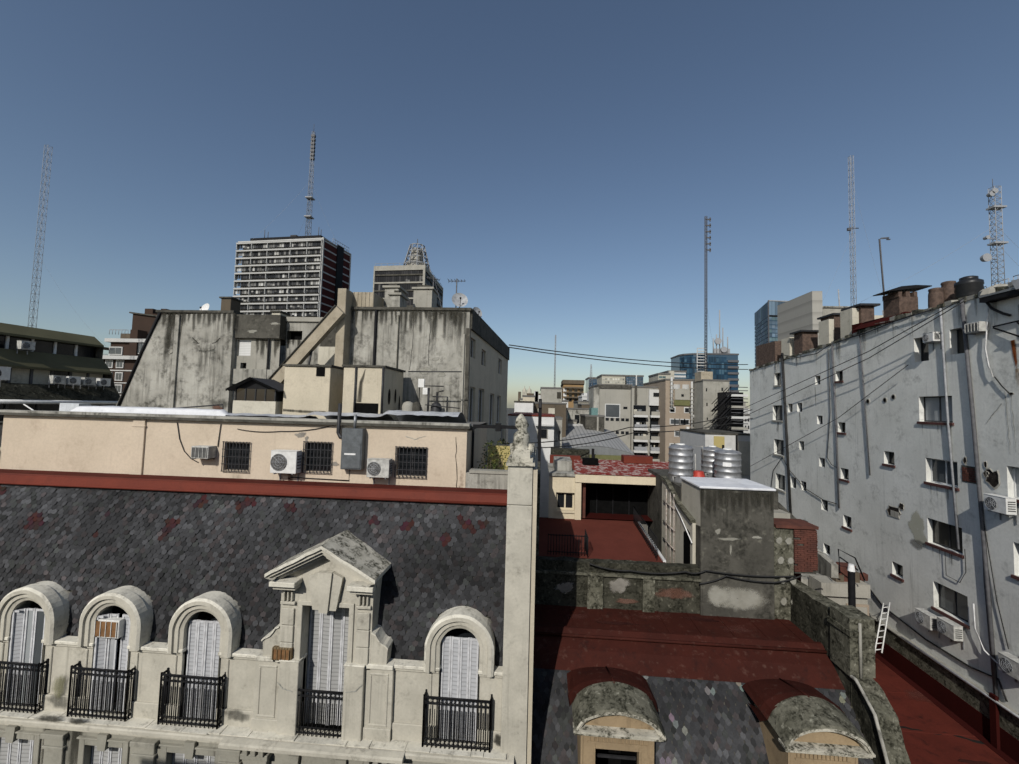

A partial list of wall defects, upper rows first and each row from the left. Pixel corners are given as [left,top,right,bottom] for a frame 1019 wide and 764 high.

water stain [159,312,236,353]
water stain [351,310,466,334]